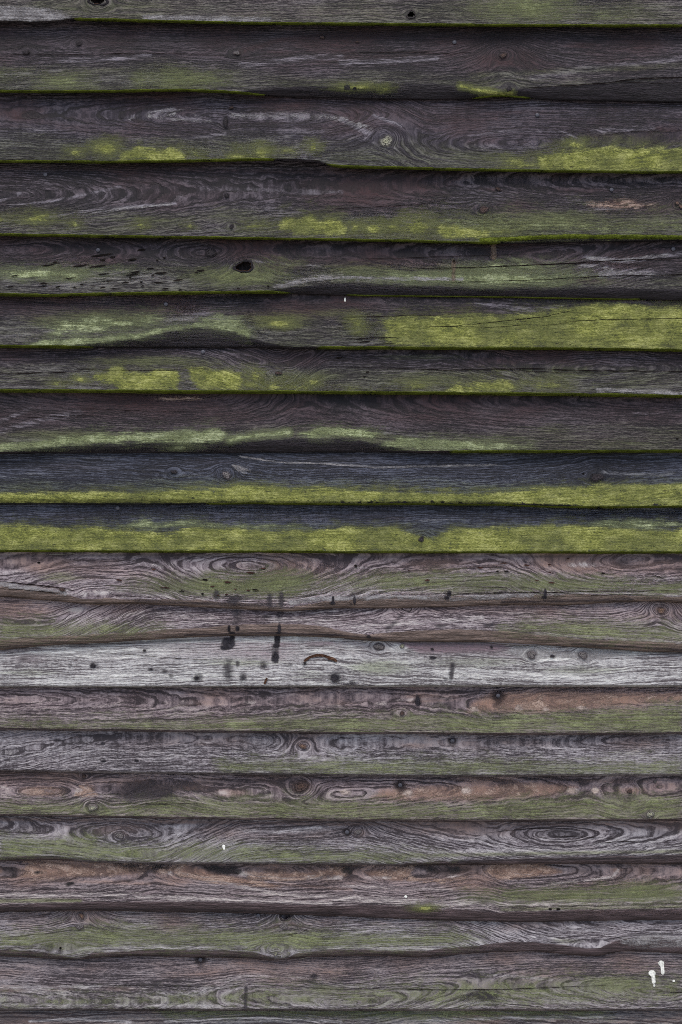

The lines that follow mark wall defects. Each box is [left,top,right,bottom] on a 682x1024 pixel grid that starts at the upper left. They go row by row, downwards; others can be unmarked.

leakage [271,636,280,663]